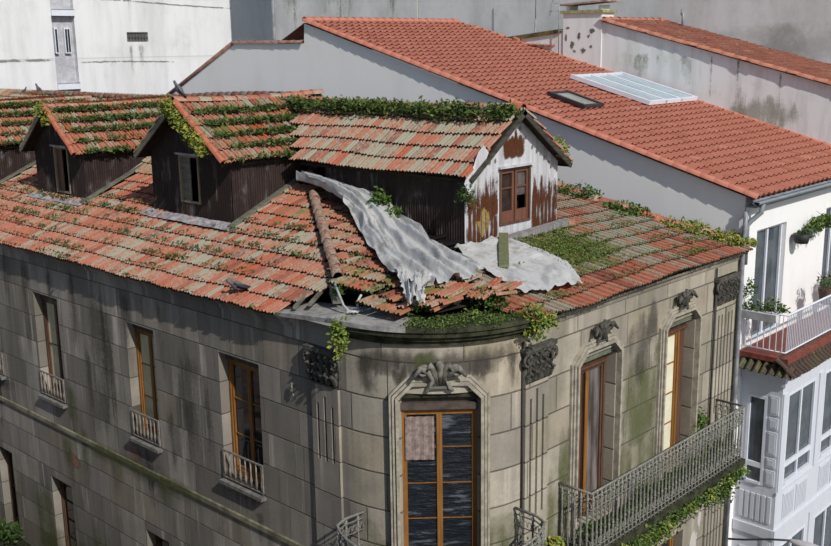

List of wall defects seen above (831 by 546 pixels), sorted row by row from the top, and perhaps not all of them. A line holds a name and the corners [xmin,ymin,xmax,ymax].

flaking render [565,27,595,53]
spalling [386,277,522,309]
leakage [360,351,515,389]